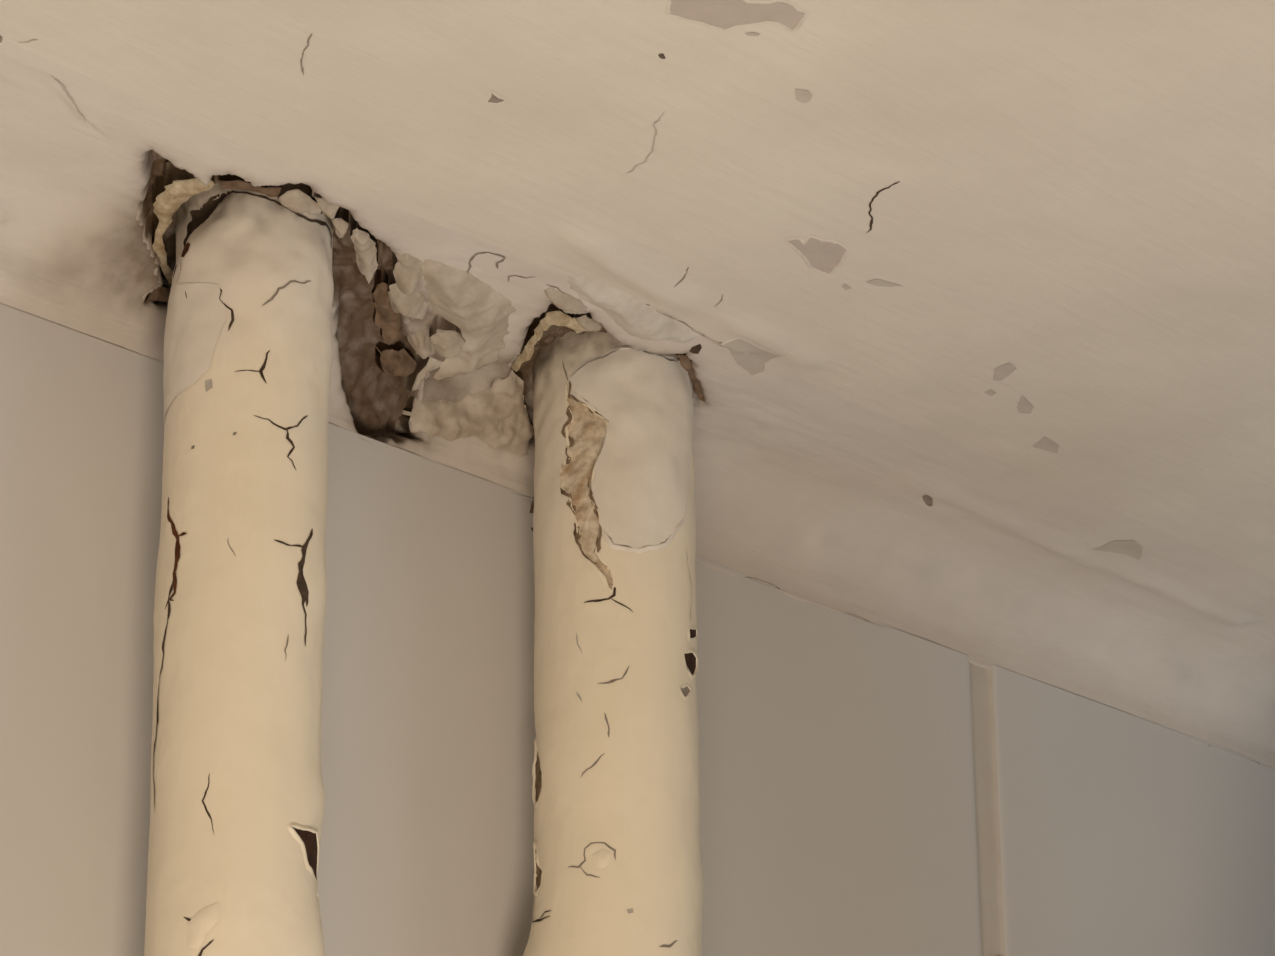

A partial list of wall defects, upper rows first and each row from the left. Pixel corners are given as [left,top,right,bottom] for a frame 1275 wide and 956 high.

peeling [664,0,810,36]
crack [867,181,900,233]
peeling [783,235,851,276]
crack [219,280,310,331]
spalling [144,161,705,457]
crack [235,350,270,384]
peeling [719,337,785,377]
crack [253,415,308,469]
peeling [1092,540,1142,560]
crack [275,529,313,661]
crack [584,584,633,612]
crack [153,497,187,809]